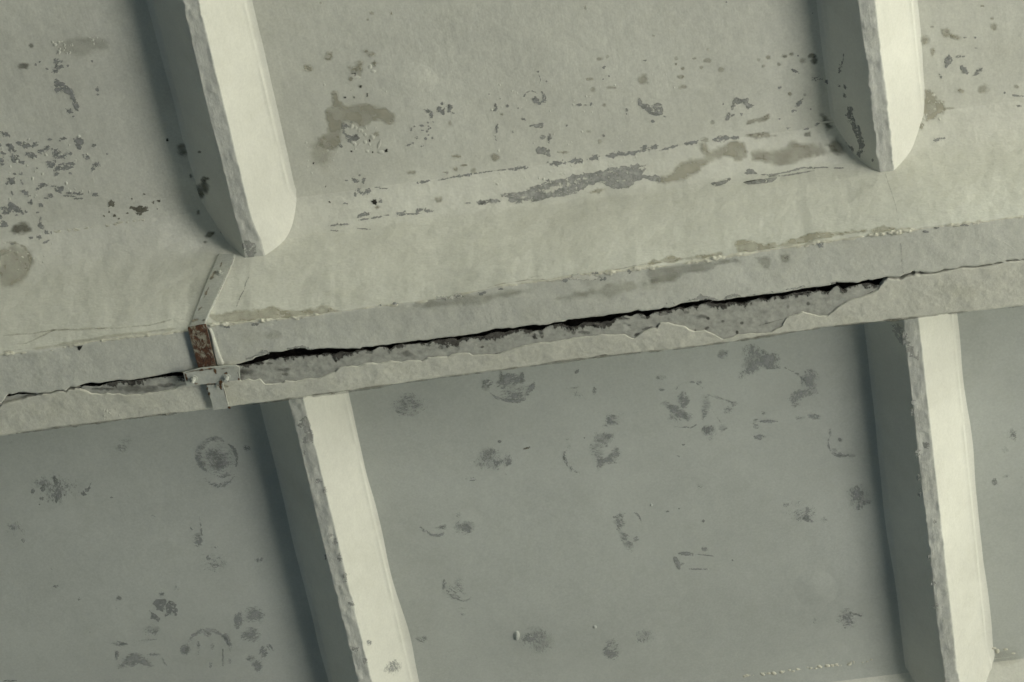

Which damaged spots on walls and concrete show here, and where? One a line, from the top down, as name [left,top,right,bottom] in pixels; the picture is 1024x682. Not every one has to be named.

peeling [35,58,79,117]
damp [320,94,392,148]
peeling [339,122,388,153]
peeling [407,102,455,147]
spalling [467,71,699,205]
peeling [0,131,108,243]
peeling [329,174,388,204]
peeling [417,166,528,184]
peeling [744,167,843,184]
peeling [331,208,433,231]
crack [236,270,944,365]
crack [6,372,184,397]